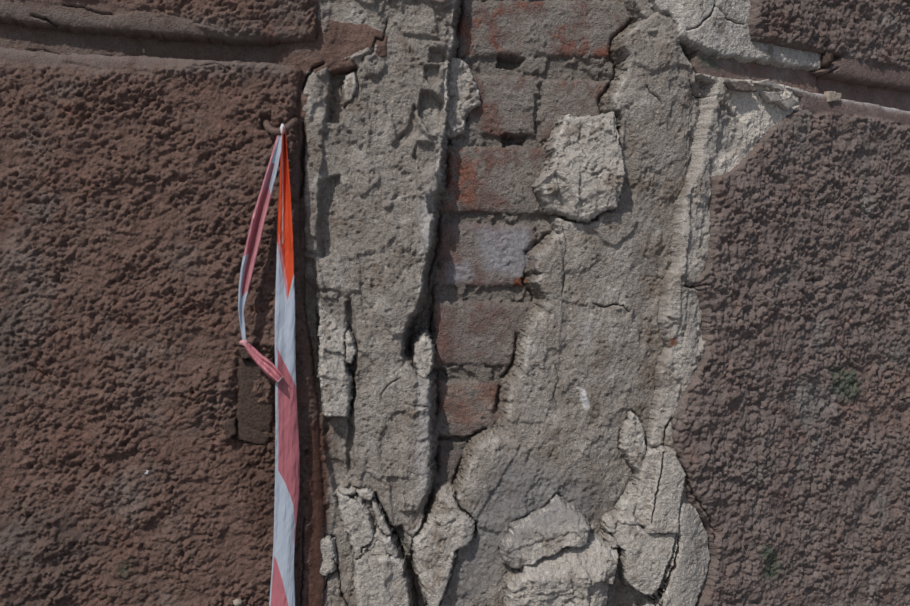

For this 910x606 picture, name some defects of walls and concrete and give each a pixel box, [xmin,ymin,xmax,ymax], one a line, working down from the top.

crack [689,0,744,30]
crack [429,311,437,349]
spalling [300,0,821,606]
crack [651,416,713,529]
crack [300,516,370,606]
crack [375,492,408,563]
crack [450,491,477,534]